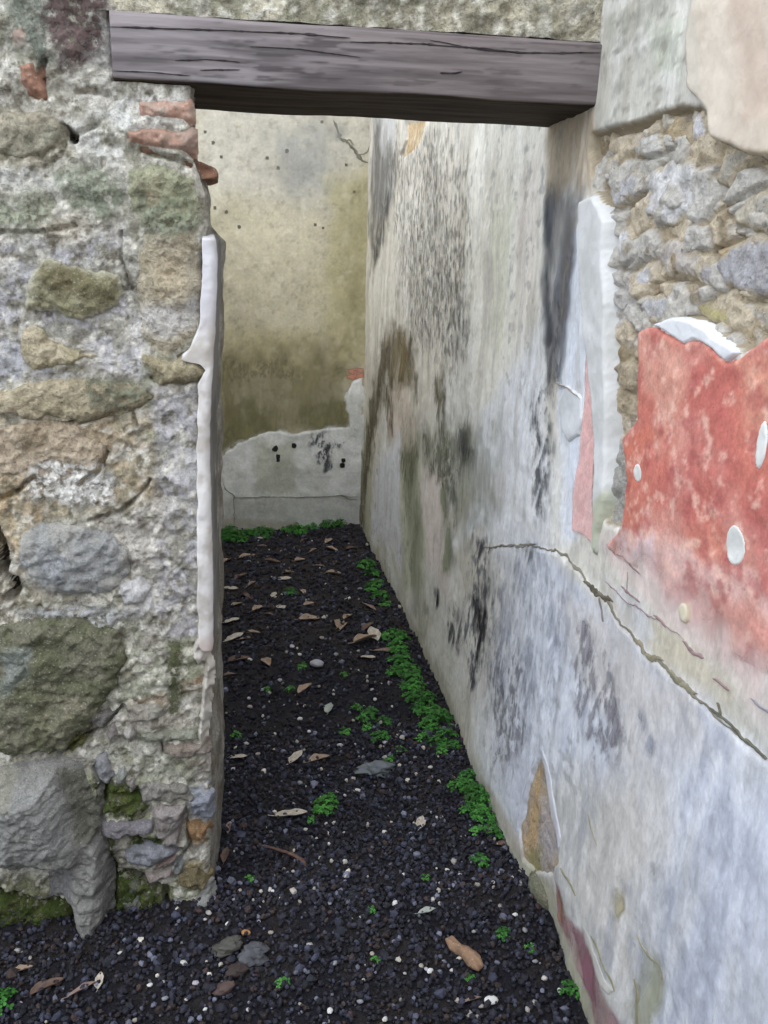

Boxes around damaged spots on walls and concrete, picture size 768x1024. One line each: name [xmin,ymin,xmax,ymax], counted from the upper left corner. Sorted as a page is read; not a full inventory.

spalling [182,234,364,745]
crack [333,120,369,163]
leakage [359,335,394,527]
leakage [368,125,469,359]
leakage [401,378,473,570]
leakage [532,192,580,514]
peeling [572,0,768,666]
leakage [448,534,525,763]
leakage [574,621,622,753]
crack [479,543,768,760]
spalling [513,747,561,874]